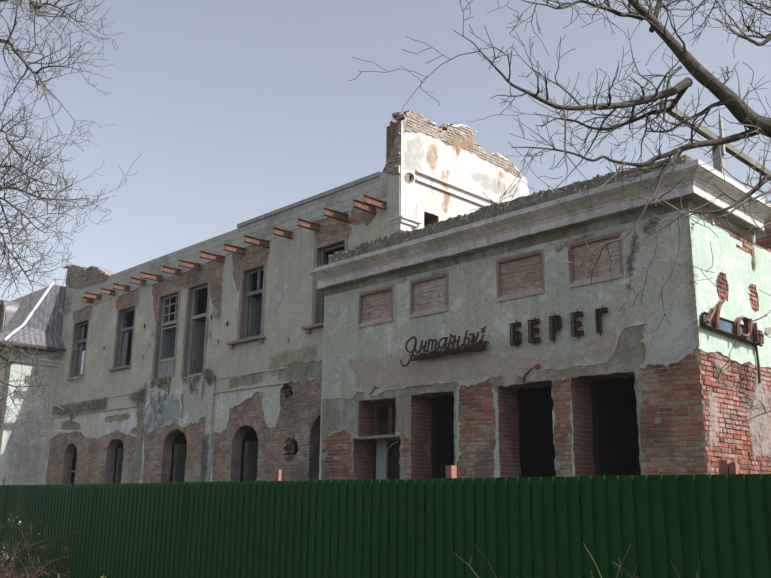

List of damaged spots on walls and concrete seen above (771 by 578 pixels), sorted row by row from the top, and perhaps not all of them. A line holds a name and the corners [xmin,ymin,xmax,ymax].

flaking render [382,111,520,178]
flaking render [716,270,730,301]
flaking render [748,283,759,312]
flaking render [47,323,709,485]